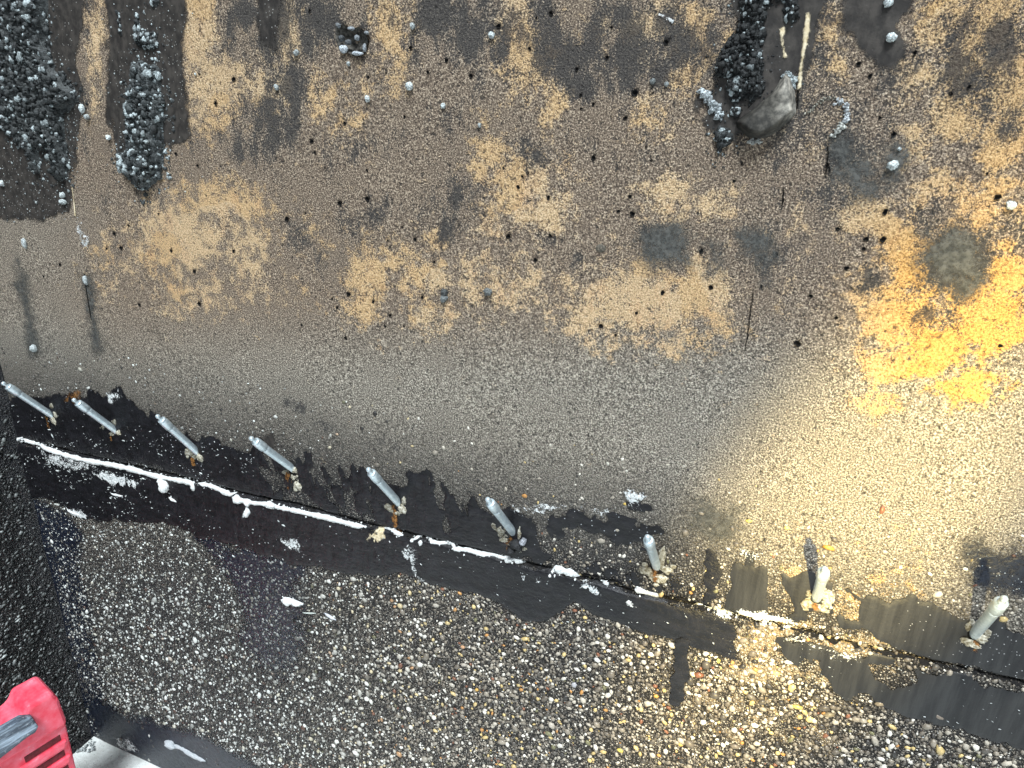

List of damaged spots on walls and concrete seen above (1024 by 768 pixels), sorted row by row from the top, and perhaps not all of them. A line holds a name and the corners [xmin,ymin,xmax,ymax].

crack [19,443,1024,687]